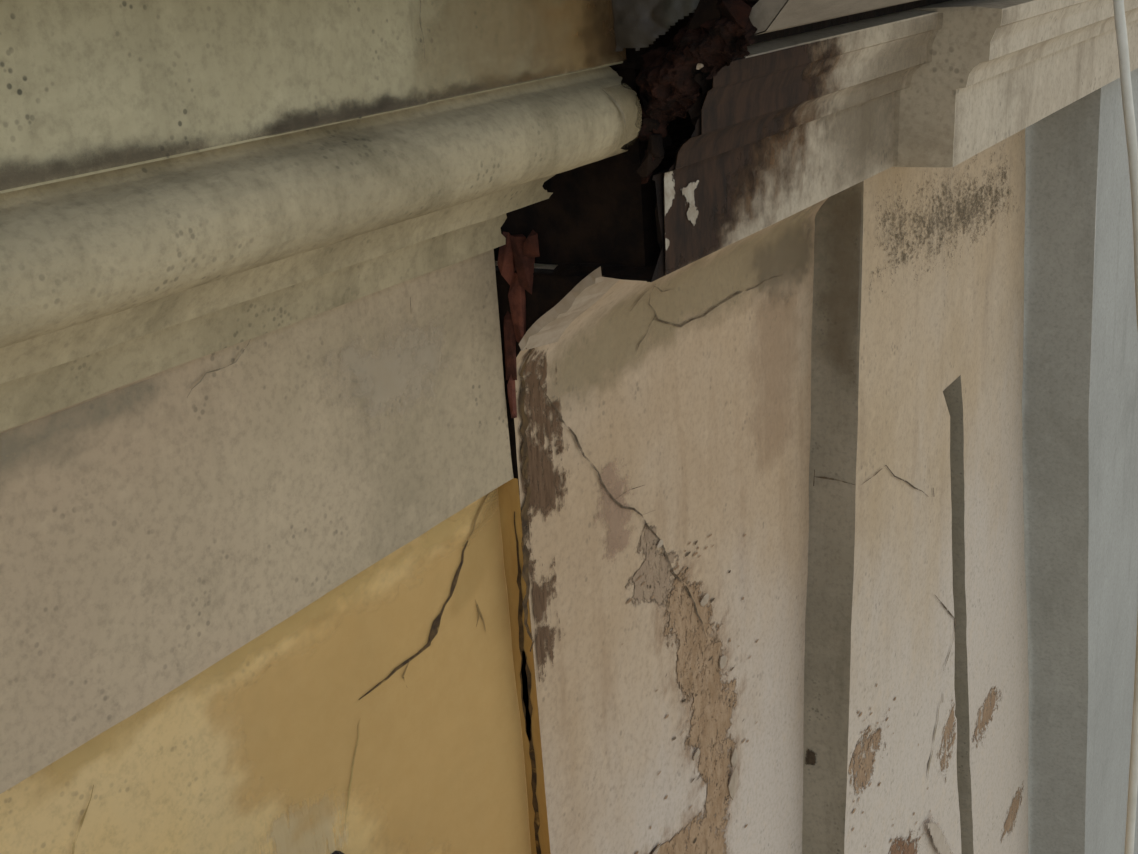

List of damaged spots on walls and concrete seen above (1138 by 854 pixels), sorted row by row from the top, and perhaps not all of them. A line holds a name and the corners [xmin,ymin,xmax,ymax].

spalling [497,230,620,418]
spalling [636,0,757,226]
crack [631,276,779,351]
damp [663,37,842,275]
damp [831,149,1020,358]
crack [813,465,934,494]
crack [72,785,94,854]
crack [346,492,491,812]
crack [514,348,707,854]
peeling [626,525,758,854]
peeling [848,697,896,814]
peeling [973,687,1002,747]